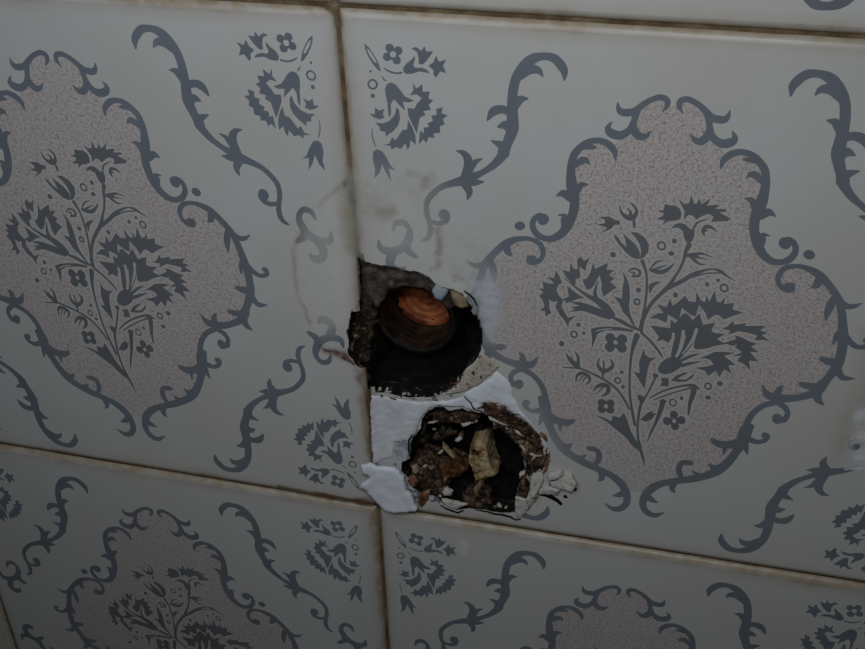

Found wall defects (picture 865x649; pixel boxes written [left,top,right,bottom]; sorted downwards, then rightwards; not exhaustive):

spalling [348,254,577,518]